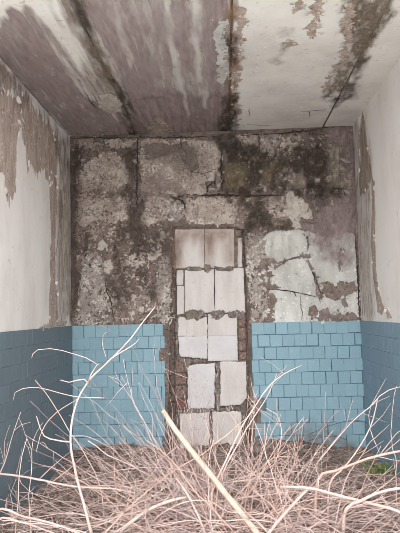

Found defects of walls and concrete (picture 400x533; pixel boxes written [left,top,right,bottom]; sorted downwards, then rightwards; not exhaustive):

peeling [212,6,250,127]
peeling [279,39,298,50]
peeling [290,0,328,39]
water stain [323,0,393,106]
peeling [0,60,67,331]
crack [6,64,284,220]
water stain [0,0,370,321]
crack [242,125,346,157]
peeling [358,112,392,319]
crack [271,219,326,319]
crack [353,228,361,319]